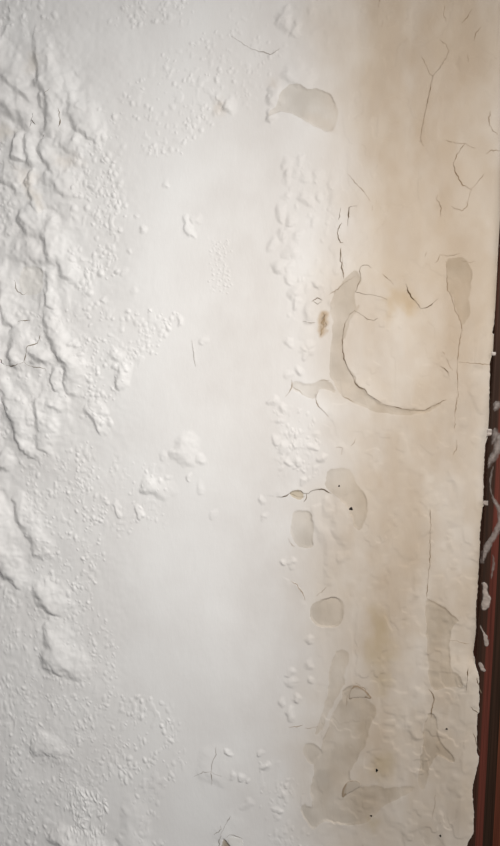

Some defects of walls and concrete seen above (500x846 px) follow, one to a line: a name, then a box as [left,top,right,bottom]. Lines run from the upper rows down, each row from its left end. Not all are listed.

peeling [268,83,338,131]
crack [420,7,481,146]
crack [436,111,498,215]
peeling [446,257,473,325]
peeling [290,271,441,416]
peeling [290,510,314,548]
peeling [325,468,368,530]
peeling [310,597,344,628]
peeling [222,837,243,846]